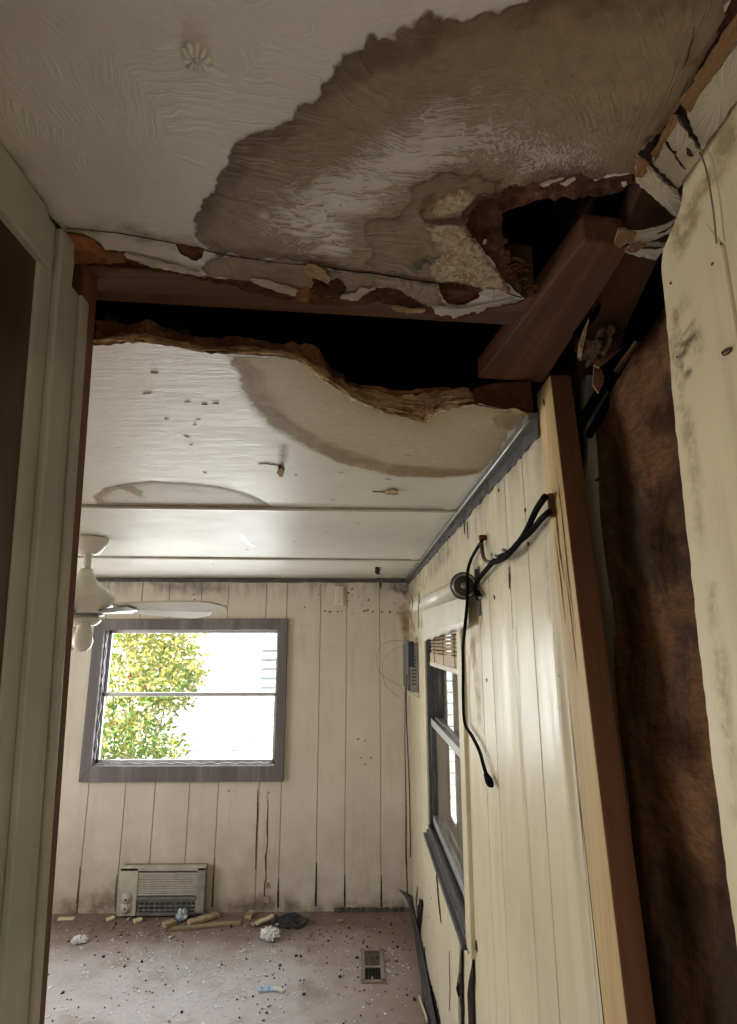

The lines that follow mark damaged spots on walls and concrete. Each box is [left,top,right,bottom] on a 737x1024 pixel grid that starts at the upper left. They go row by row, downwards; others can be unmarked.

damp [194,0,728,310]
peeling [539,177,576,187]
peeling [124,253,206,278]
peeling [250,263,376,302]
peeling [390,288,521,319]
damp [232,357,524,477]
damp [96,482,269,507]